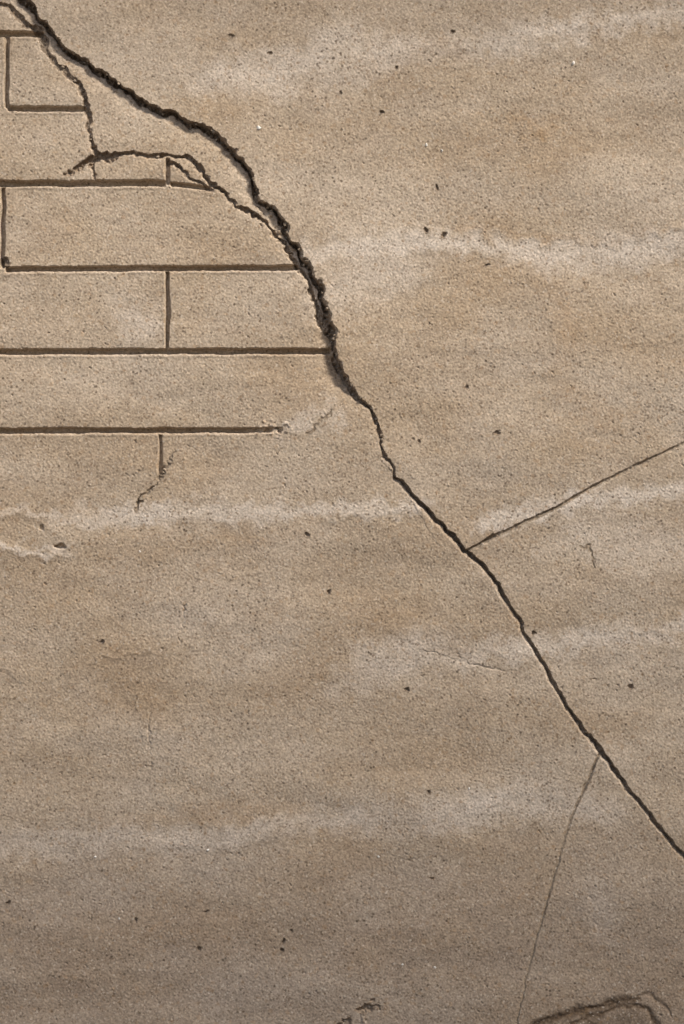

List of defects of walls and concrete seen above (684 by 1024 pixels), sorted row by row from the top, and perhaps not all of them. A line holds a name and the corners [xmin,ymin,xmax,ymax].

crack [0,0,399,480]
crack [134,451,177,512]
crack [396,441,684,1024]